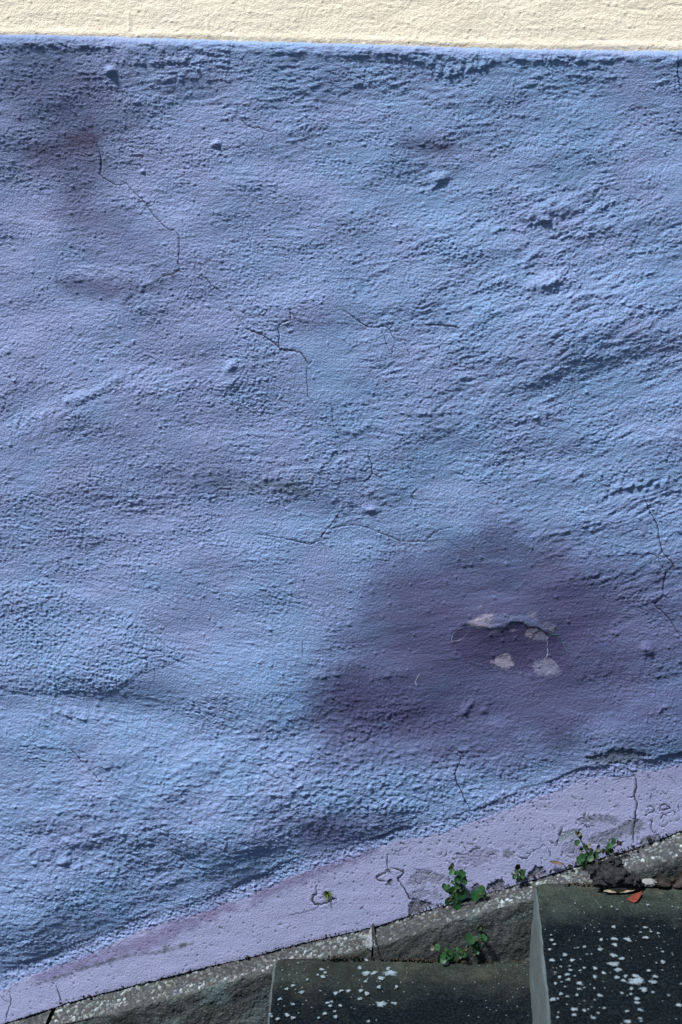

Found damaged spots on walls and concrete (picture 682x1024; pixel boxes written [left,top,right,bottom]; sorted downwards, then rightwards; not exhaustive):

crack [96,142,461,434]
crack [629,497,682,637]
peeling [451,605,569,678]
damp [585,599,682,701]